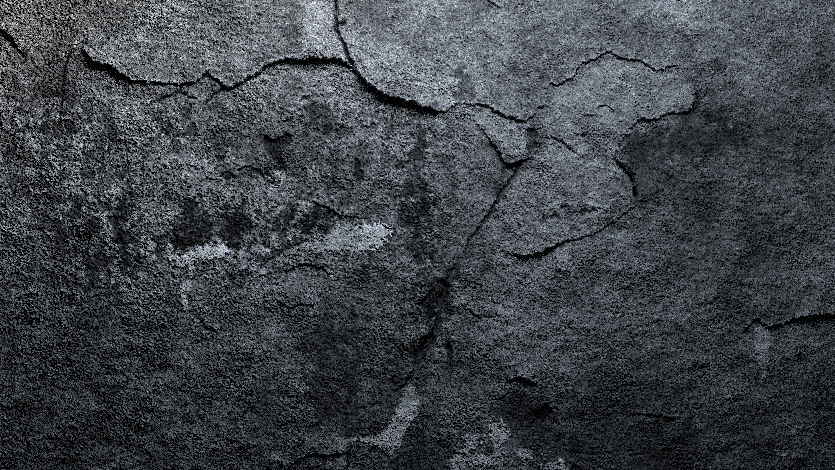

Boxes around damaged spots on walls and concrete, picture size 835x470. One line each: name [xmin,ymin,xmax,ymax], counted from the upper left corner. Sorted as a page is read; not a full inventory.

crack [333,0,355,71]
crack [150,86,225,106]
crack [464,168,520,253]
crack [614,160,639,204]
crack [394,269,483,393]